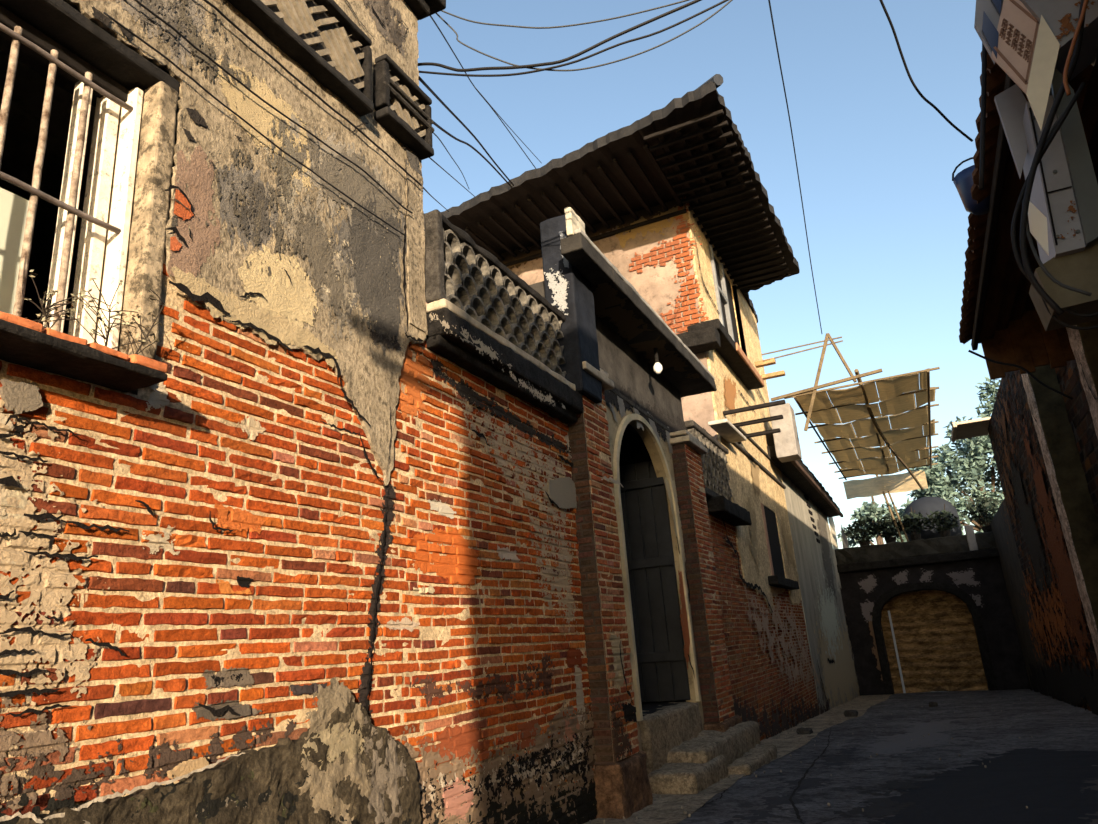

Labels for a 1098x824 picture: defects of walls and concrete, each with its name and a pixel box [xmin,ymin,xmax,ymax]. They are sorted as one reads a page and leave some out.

spalling [182,107,208,141]
peeling [213,55,322,195]
spalling [170,236,182,251]
spalling [174,189,194,220]
spalling [627,196,709,334]
peeling [171,244,433,419]
peeling [429,313,566,409]
flaking render [0,479,36,520]
crack [169,280,392,714]
peeling [858,574,878,623]
peeling [892,568,983,607]
leakage [0,712,299,810]